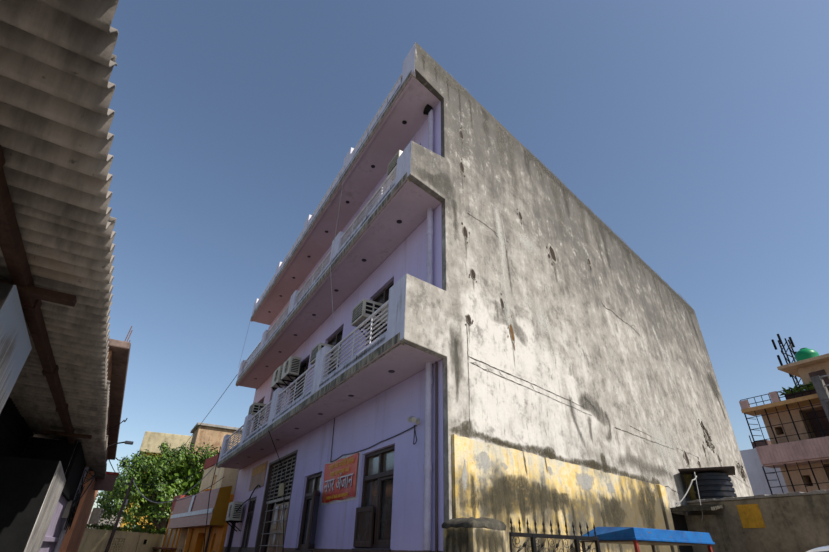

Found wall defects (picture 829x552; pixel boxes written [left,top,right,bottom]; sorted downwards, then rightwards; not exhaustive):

leakage [570,395,611,439]
leakage [446,421,682,552]